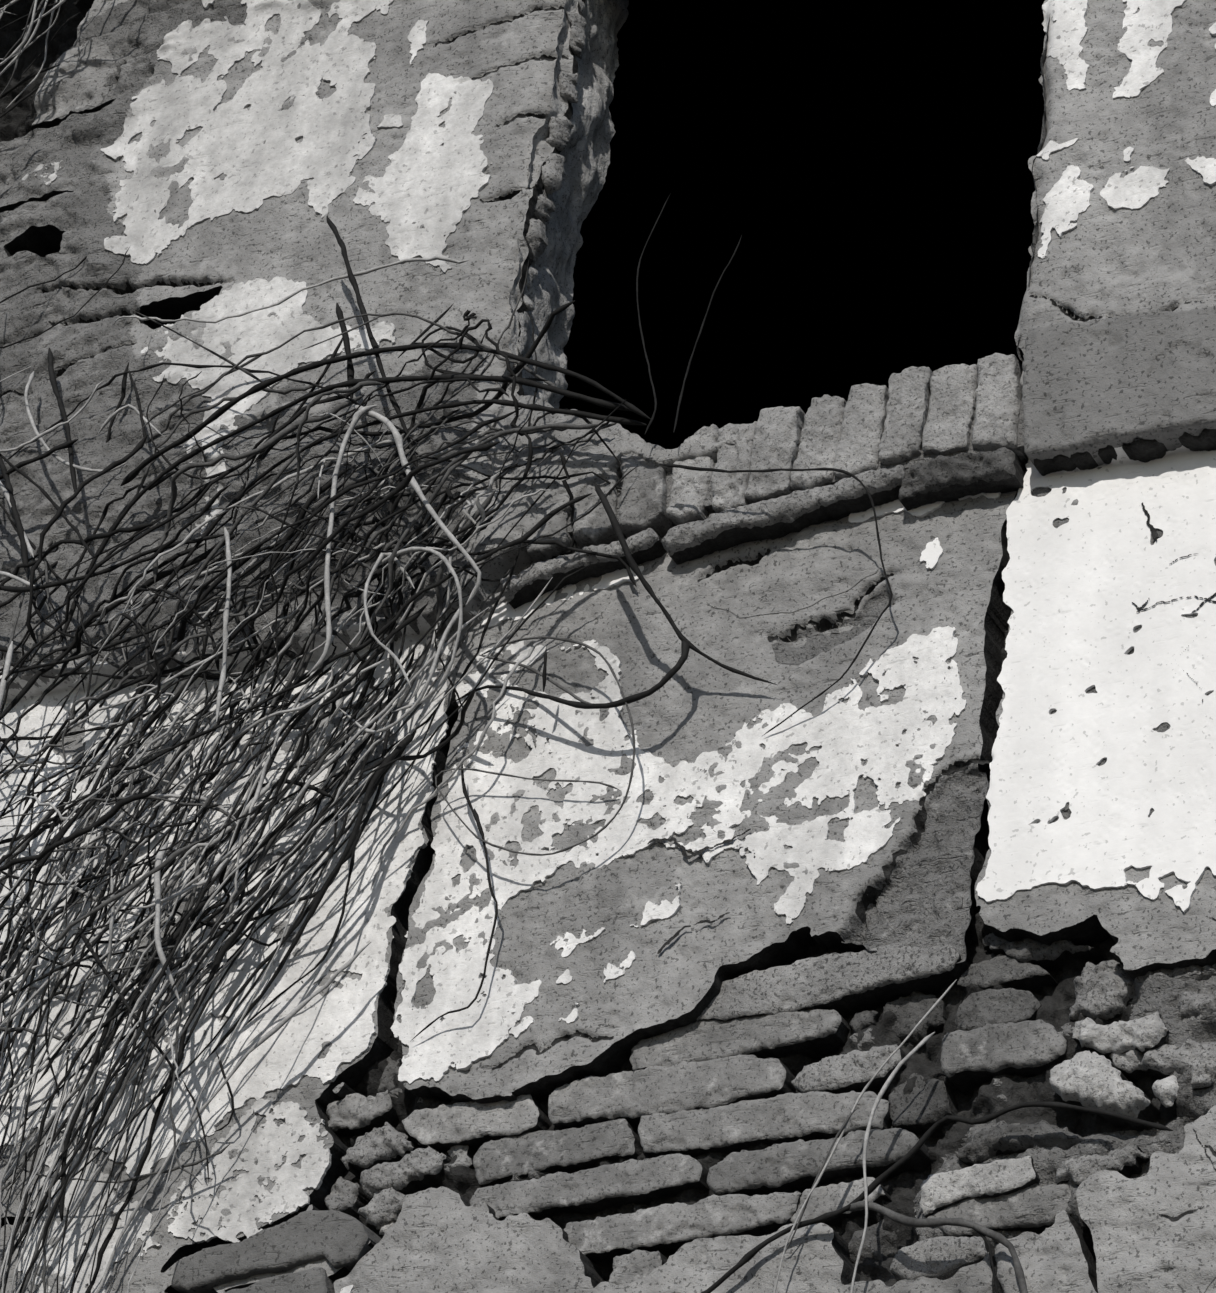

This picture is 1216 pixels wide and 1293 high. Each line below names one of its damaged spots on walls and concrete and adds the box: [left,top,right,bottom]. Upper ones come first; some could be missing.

peeling [1042,0,1090,91]
peeling [1113,0,1187,99]
peeling [100,0,494,273]
peeling [1037,138,1078,161]
peeling [1038,147,1170,259]
peeling [1185,156,1216,186]
crack [1000,630,1009,671]
spalling [0,439,1216,1293]
crack [855,757,993,945]
crack [1193,1129,1216,1170]
crack [1153,1206,1204,1221]